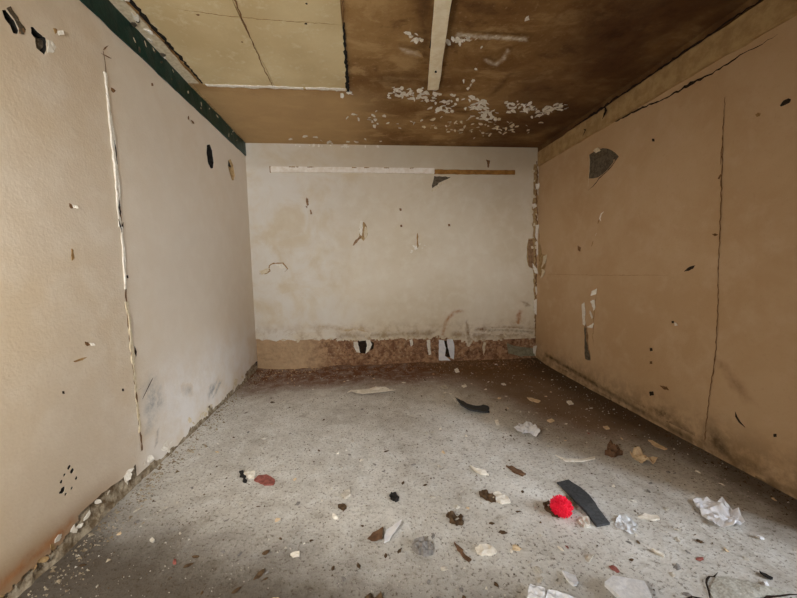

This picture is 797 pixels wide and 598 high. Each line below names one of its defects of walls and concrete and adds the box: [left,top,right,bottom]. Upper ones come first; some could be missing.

spalling [2,6,65,54]
damp [362,0,468,95]
peeling [446,35,483,49]
damp [453,0,748,100]
peeling [387,68,567,139]
spalling [588,148,619,188]
spalling [0,161,547,598]